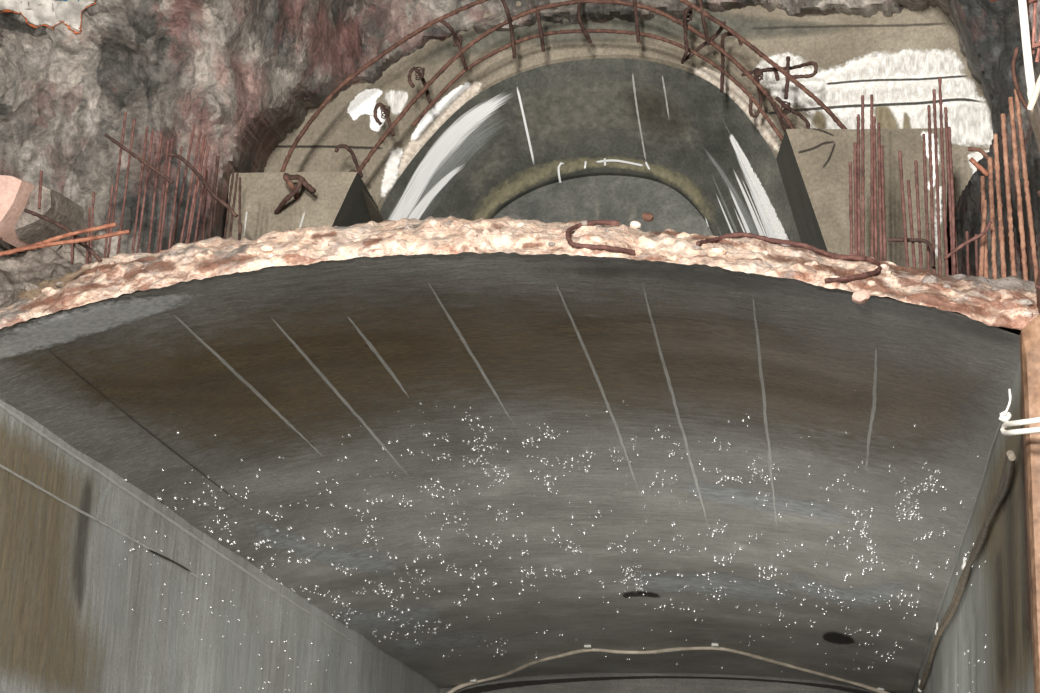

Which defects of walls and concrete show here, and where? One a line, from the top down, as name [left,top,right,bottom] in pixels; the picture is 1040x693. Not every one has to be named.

spalling [0,0,1040,330]
damp [389,76,703,221]
damp [813,111,826,129]
damp [875,106,910,129]